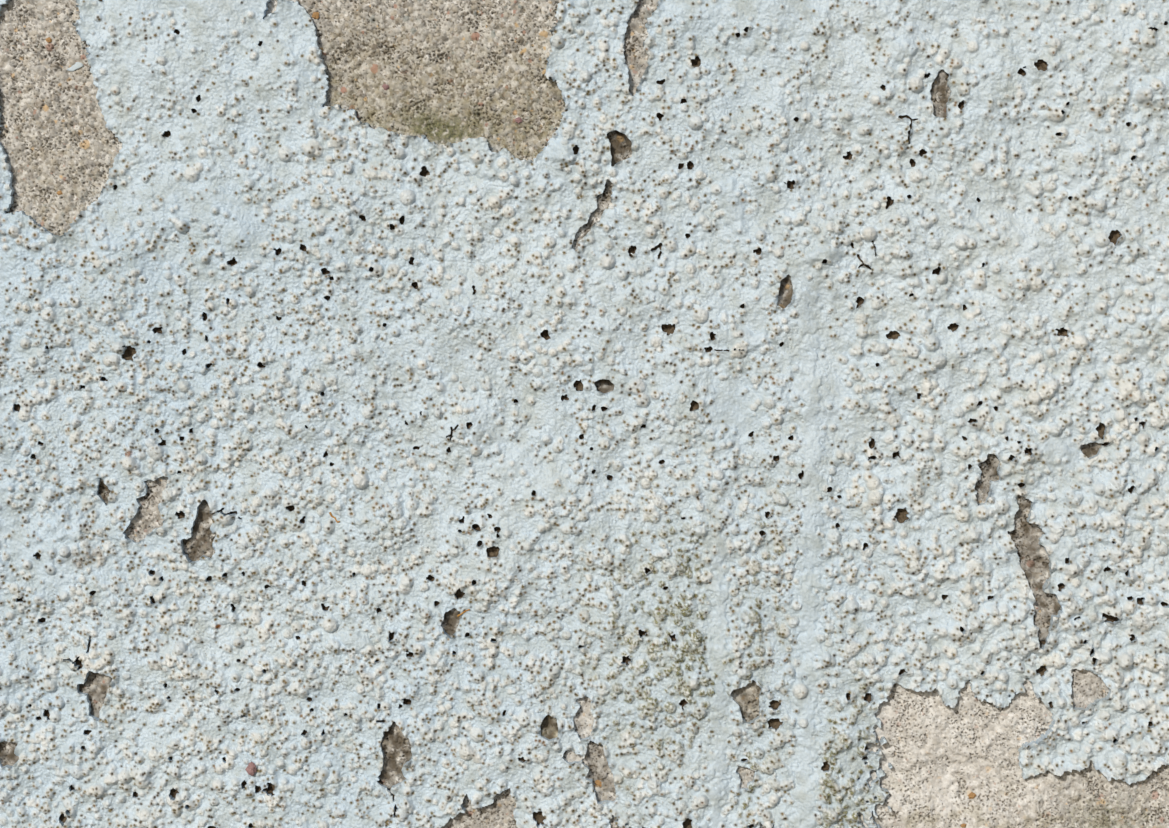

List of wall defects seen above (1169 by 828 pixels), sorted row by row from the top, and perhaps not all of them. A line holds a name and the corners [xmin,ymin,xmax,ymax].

peeling [0,0,122,236]
peeling [263,0,568,162]
peeling [623,0,659,96]
peeling [123,476,216,563]
spalling [894,507,909,524]
peeling [1007,495,1065,650]
peeling [378,721,412,791]
peeling [441,788,518,828]
peeling [540,715,558,741]
peeling [562,696,645,828]
peeling [731,680,783,732]
peeling [846,666,1169,828]